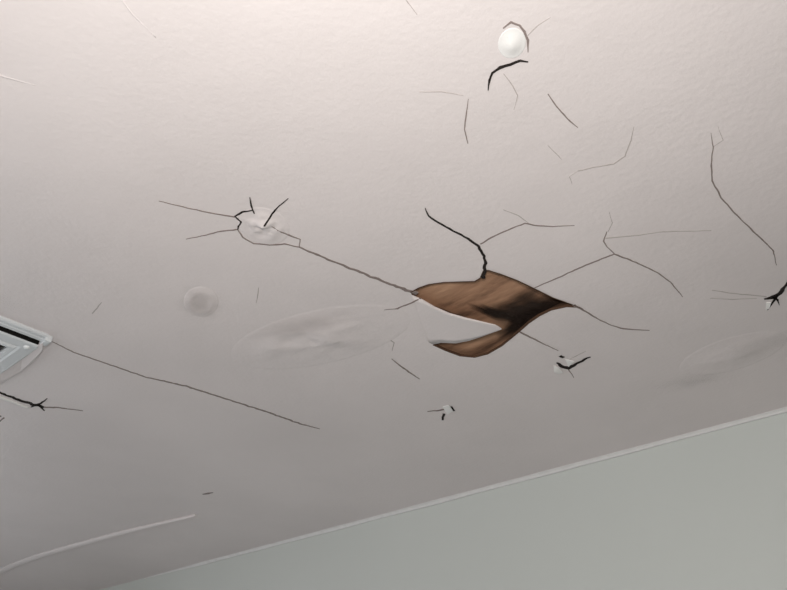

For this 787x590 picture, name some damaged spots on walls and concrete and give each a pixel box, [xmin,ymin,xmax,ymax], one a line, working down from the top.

crack [431,91,469,144]
crack [548,94,578,128]
crack [550,128,634,183]
crack [710,128,777,265]
crack [159,197,421,310]
crack [425,208,575,279]
crack [534,213,711,297]
crack [572,305,650,331]
crack [0,392,83,411]
crack [51,341,319,429]